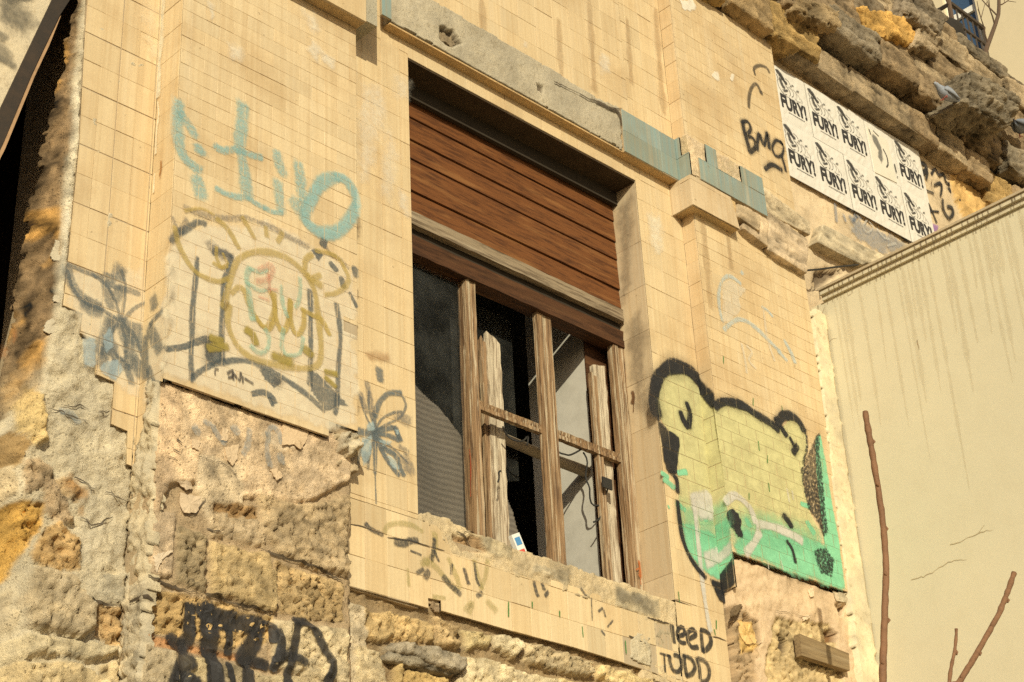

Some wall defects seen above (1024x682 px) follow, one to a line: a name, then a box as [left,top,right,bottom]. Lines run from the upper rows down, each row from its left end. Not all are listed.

spalling [439,32,456,47]
spalling [0,0,135,682]
peeling [221,428,239,466]
peeling [282,424,309,450]
peeling [176,480,203,514]
peeling [153,550,173,573]
peeling [730,604,757,644]